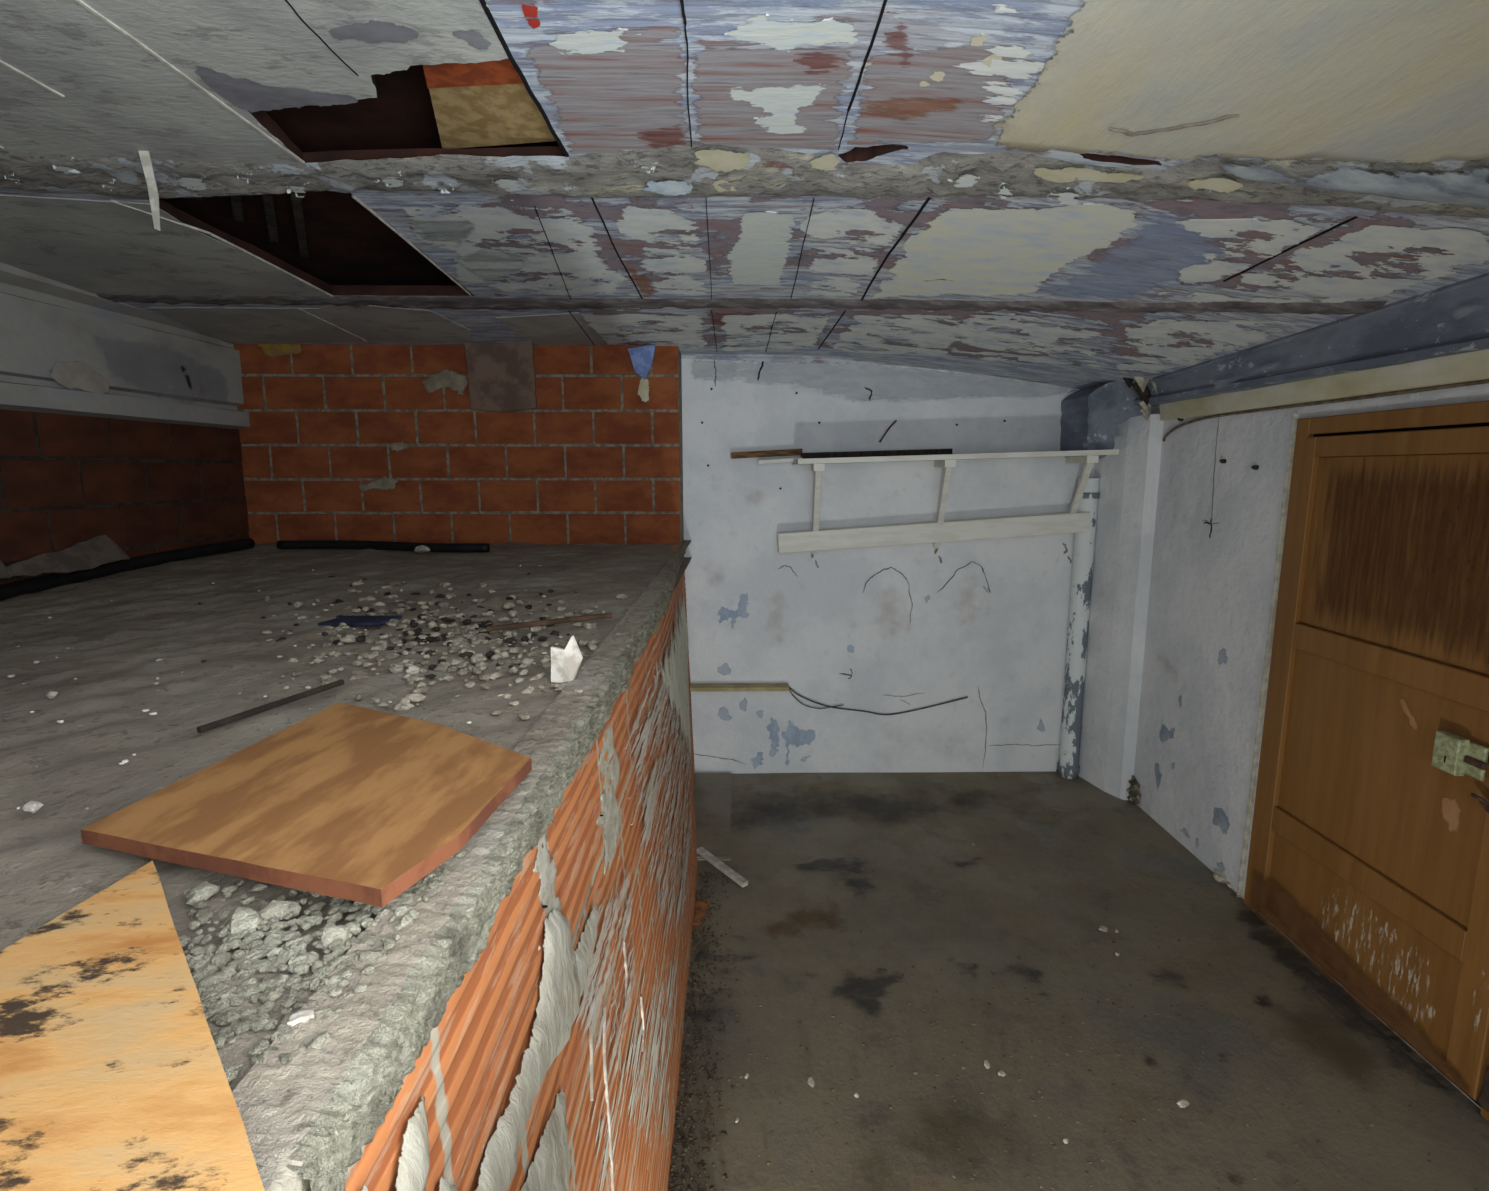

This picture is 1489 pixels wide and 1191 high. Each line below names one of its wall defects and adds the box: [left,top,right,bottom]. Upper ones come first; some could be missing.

peeling [195,66,358,113]
peeling [175,174,208,190]
peeling [286,182,309,198]
peeling [374,171,403,188]
peeling [401,0,1489,421]
peeling [718,594,749,629]
peeling [718,699,815,769]
spalling [232,540,686,1191]